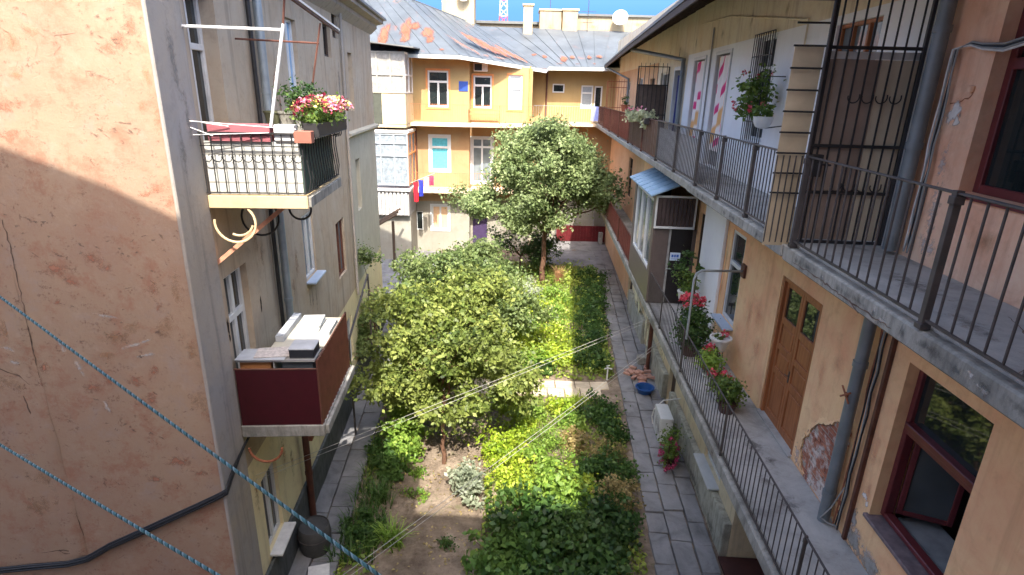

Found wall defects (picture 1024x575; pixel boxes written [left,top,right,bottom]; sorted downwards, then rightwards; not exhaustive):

rust [378,20,444,51]
peeling [947,102,962,125]
crack [0,220,40,414]
spalling [796,417,853,516]